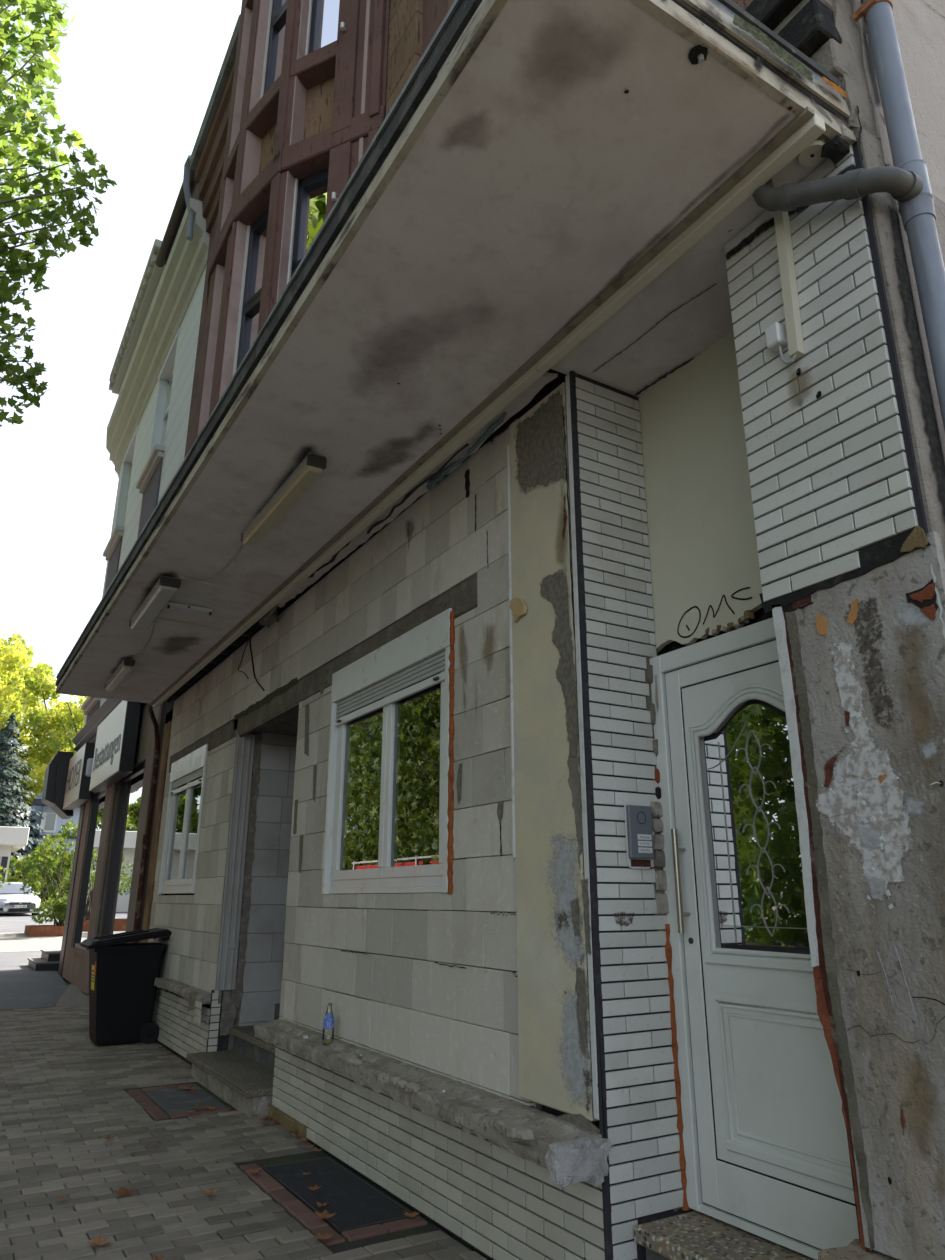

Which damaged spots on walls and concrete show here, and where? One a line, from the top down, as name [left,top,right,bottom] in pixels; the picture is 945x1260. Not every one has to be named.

damp [681,0,848,121]
flaking render [905,564,945,638]
peeling [540,569,591,1111]
crack [847,969,945,1044]